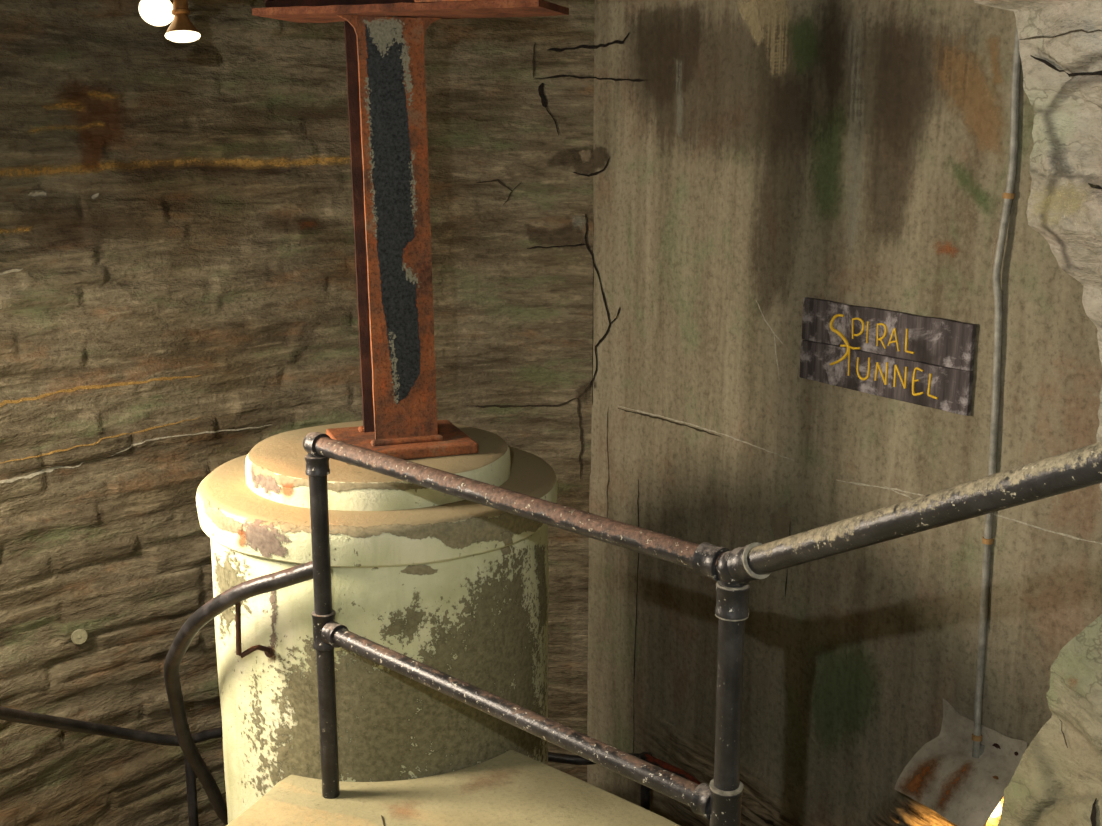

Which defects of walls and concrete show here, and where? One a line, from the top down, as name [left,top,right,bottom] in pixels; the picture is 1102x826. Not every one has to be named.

crack [532,33,648,135]
damp [739,0,791,74]
crack [1019,29,1102,77]
crack [476,179,519,205]
crack [467,214,794,517]
peeling [250,463,309,495]
peeling [327,482,426,493]
peeling [203,500,311,595]
peeling [329,512,548,715]
peeling [240,635,322,797]
peeling [334,647,548,782]
crack [1089,798,1097,826]